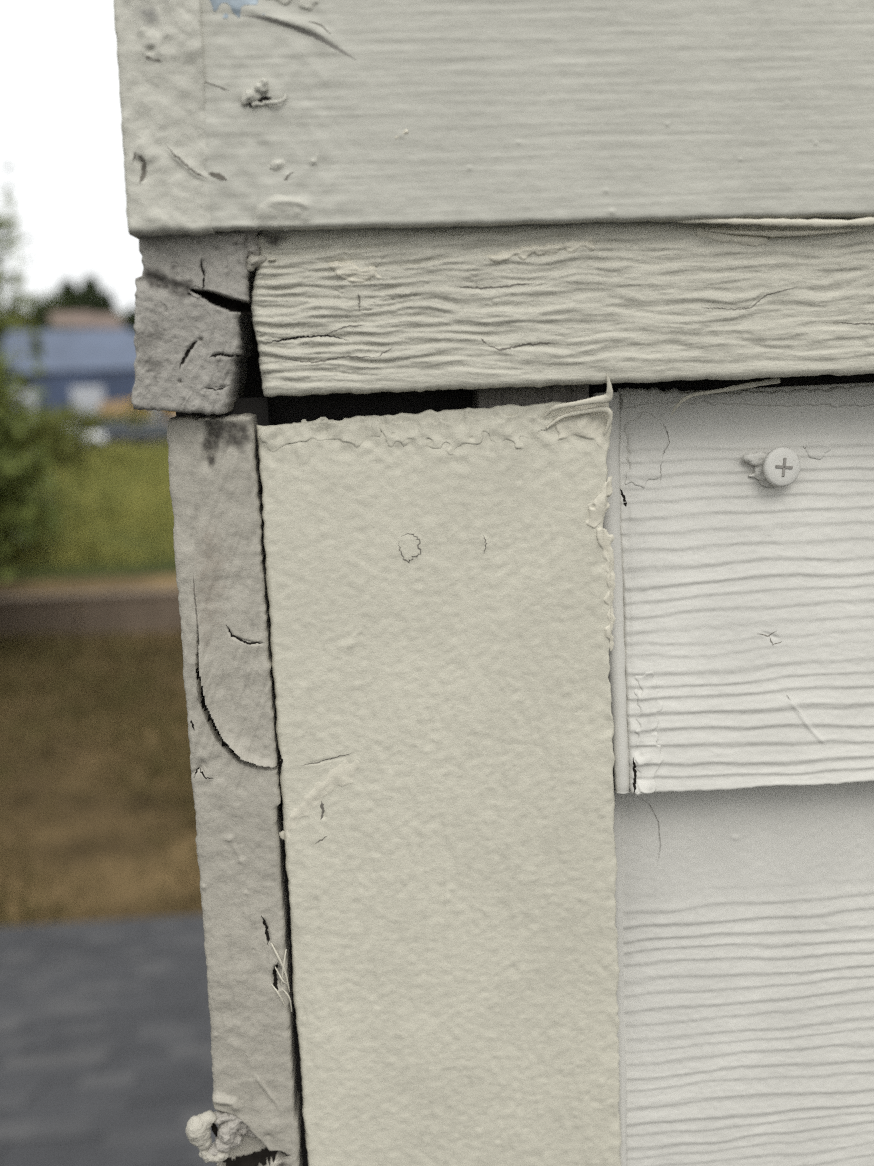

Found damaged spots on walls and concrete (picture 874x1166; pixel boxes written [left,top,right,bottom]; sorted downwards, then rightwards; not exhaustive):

peeling [210,0,319,18]
peeling [260,373,613,455]
crack [193,578,261,645]
peeling [585,476,616,651]
crack [190,667,249,763]
crack [277,745,354,771]
peeling [634,670,664,796]
crack [261,915,292,1012]